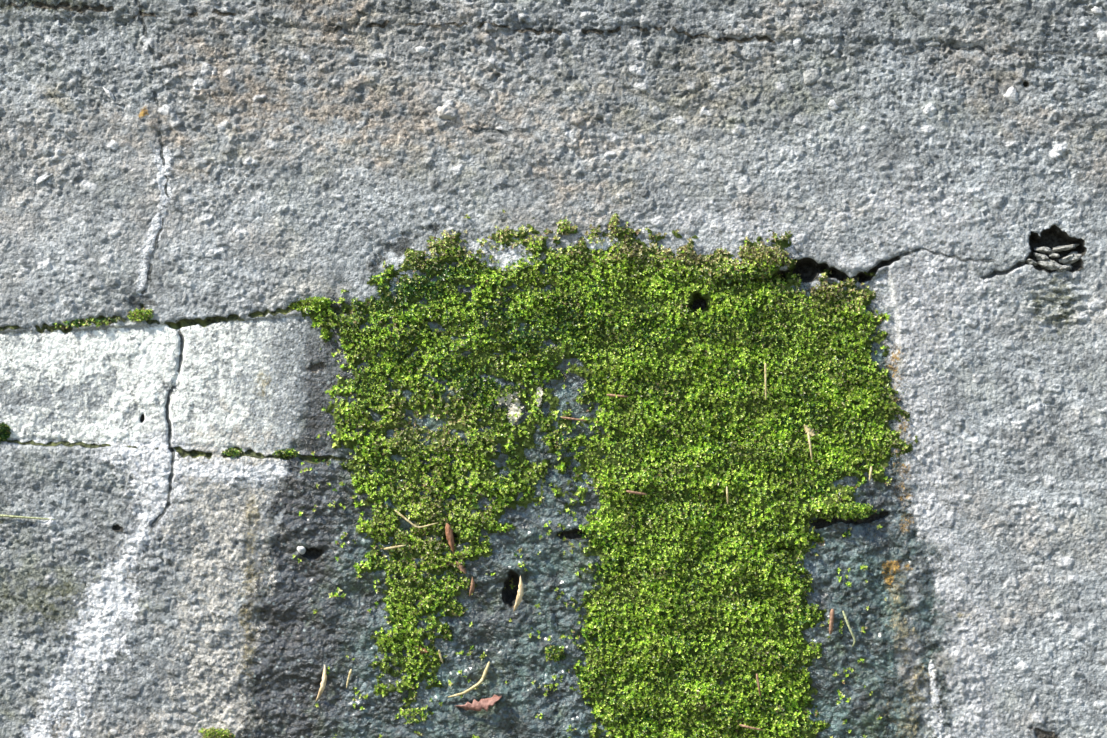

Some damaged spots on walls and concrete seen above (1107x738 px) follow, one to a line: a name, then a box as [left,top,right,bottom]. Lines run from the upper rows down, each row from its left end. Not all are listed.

crack [0,0,371,535]
water stain [571,236,619,251]
water stain [671,203,814,254]
crack [776,248,1026,283]
spalling [1025,225,1087,273]
water stain [21,222,610,738]
water stain [796,179,1006,738]